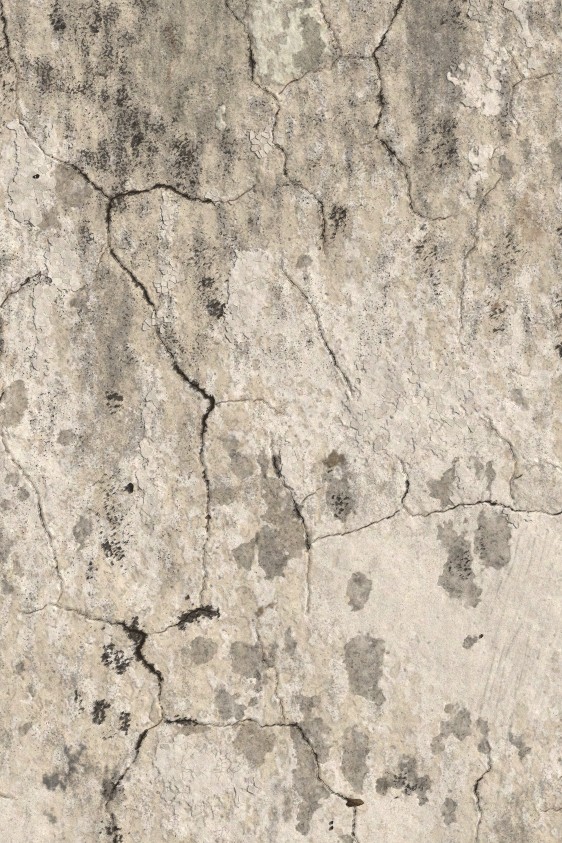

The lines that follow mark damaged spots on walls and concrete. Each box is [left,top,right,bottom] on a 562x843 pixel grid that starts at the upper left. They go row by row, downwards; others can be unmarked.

peeling [7,119,92,376]
damp [49,0,68,31]
damp [71,1,154,176]
damp [173,129,196,193]
damp [185,237,233,319]
damp [316,202,351,253]
crack [225,0,453,255]
crack [458,176,502,342]
peeling [447,0,548,116]
crack [0,2,359,843]
crack [270,418,562,612]
crack [474,746,491,842]